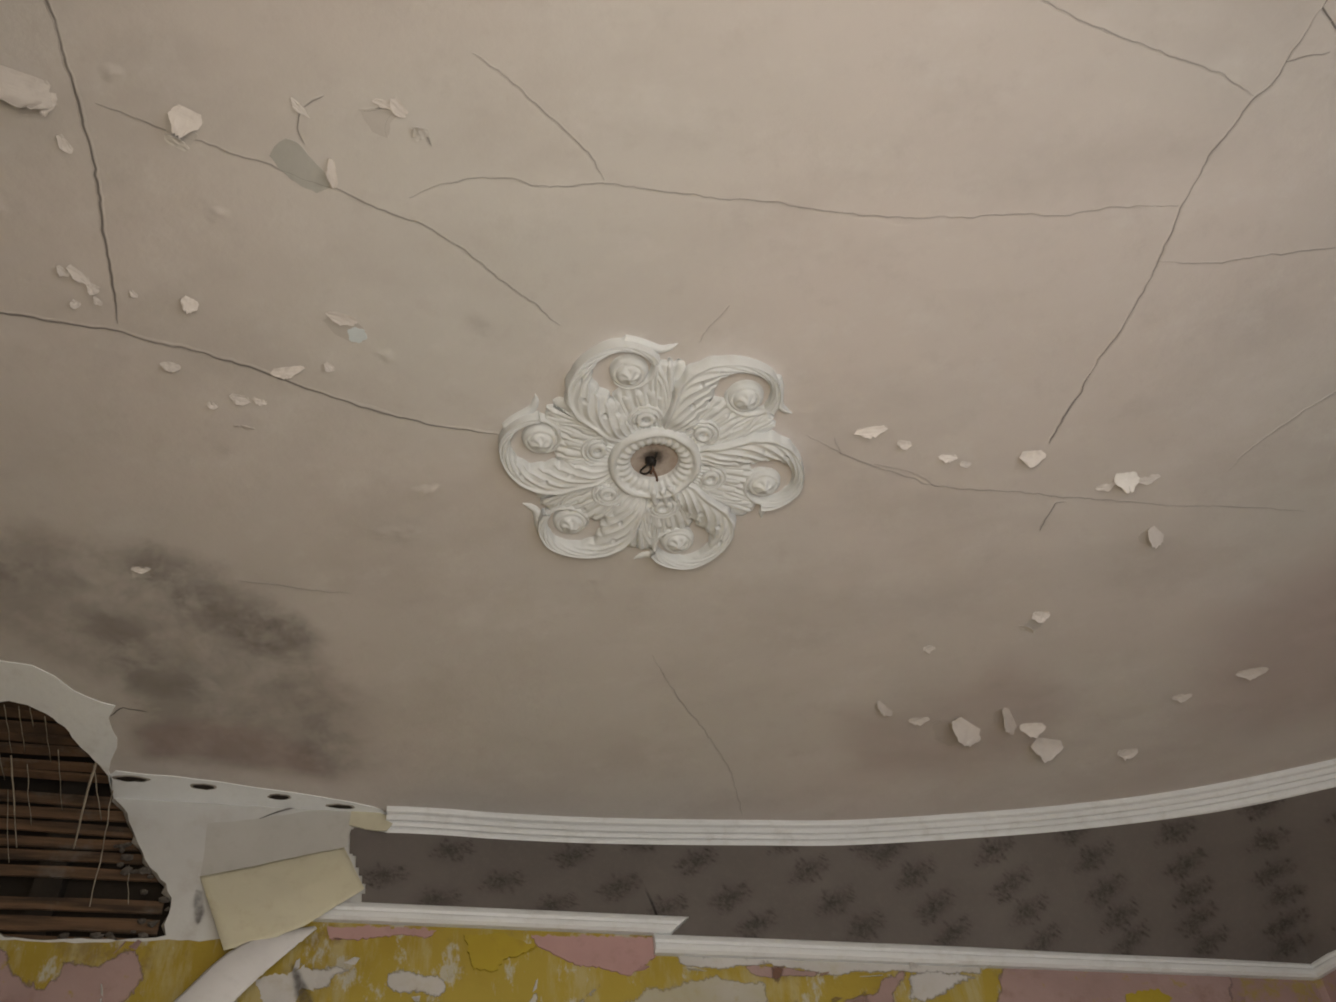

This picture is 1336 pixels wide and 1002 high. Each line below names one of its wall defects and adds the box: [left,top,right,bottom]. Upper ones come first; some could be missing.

peeling [0,65,57,117]
peeling [164,104,202,152]
peeling [269,138,338,193]
crack [1040,0,1336,444]
peeling [854,425,912,451]
peeling [1019,450,1046,468]
peeling [1095,472,1161,494]
peeling [908,707,1063,763]
spalling [0,660,387,1002]
peeling [464,932,656,976]
peeling [387,970,446,1002]
peeling [627,956,1245,1002]